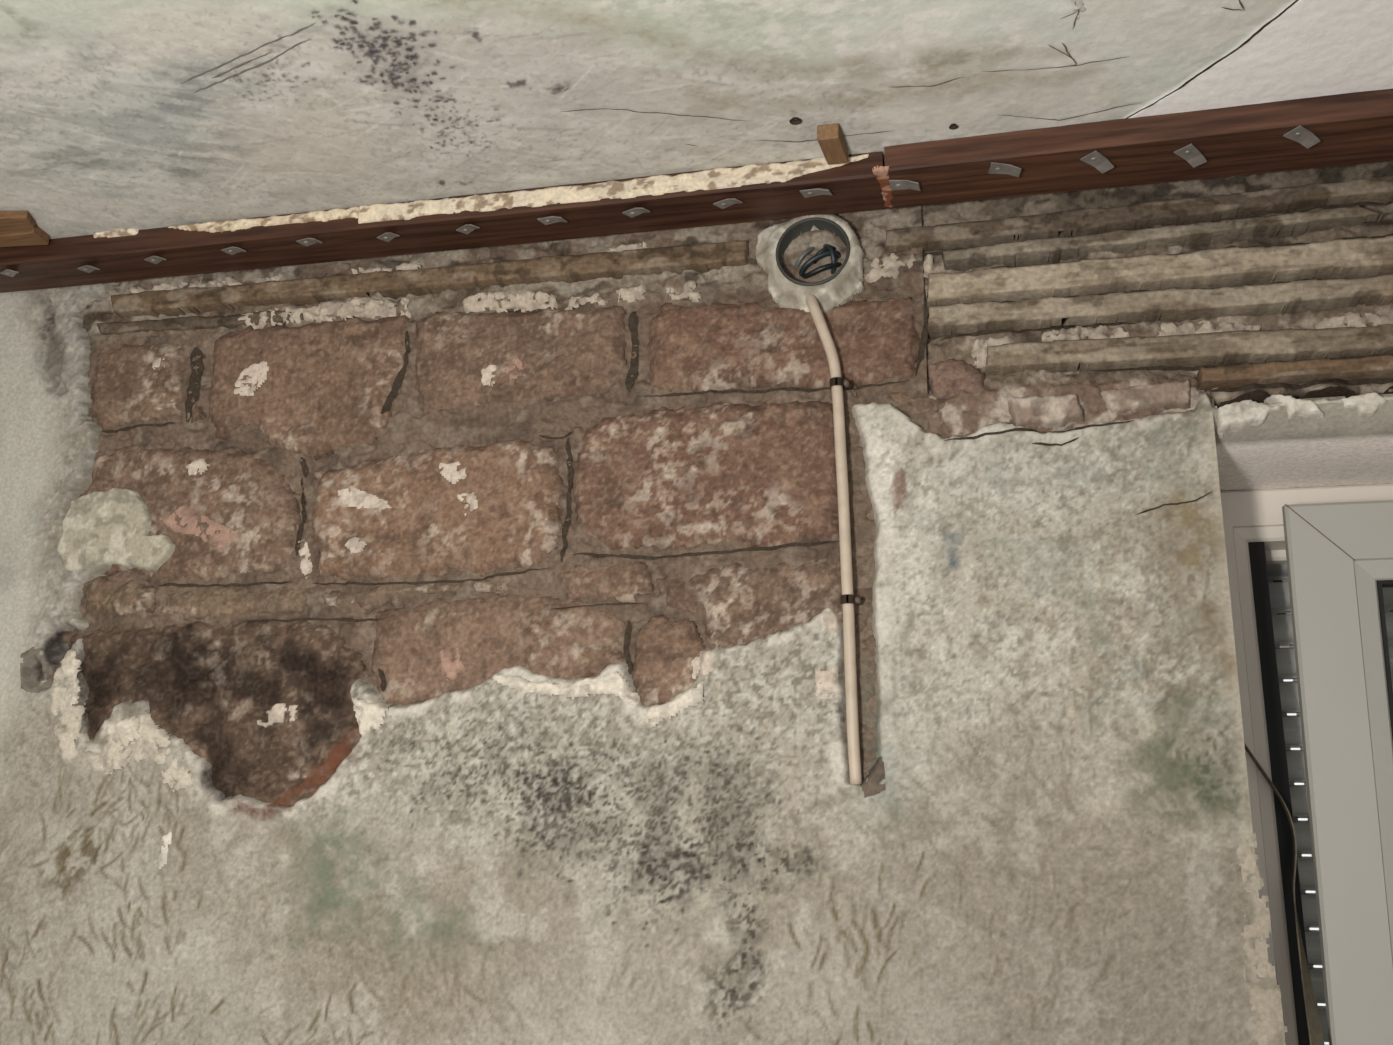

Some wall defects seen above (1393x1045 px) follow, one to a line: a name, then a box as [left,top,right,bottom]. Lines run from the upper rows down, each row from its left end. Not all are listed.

damp [334,0,459,148]
flaking render [20,161,1393,807]
damp [447,735,788,912]